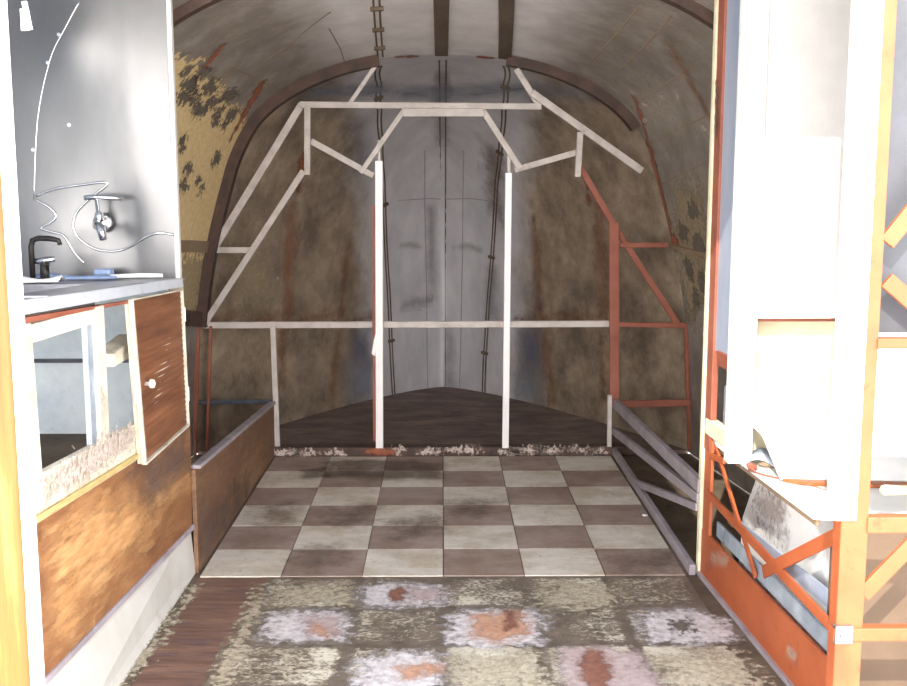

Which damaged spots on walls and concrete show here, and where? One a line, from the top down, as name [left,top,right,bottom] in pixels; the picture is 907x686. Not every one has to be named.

rust [229,79,267,142]
rust [632,96,672,236]